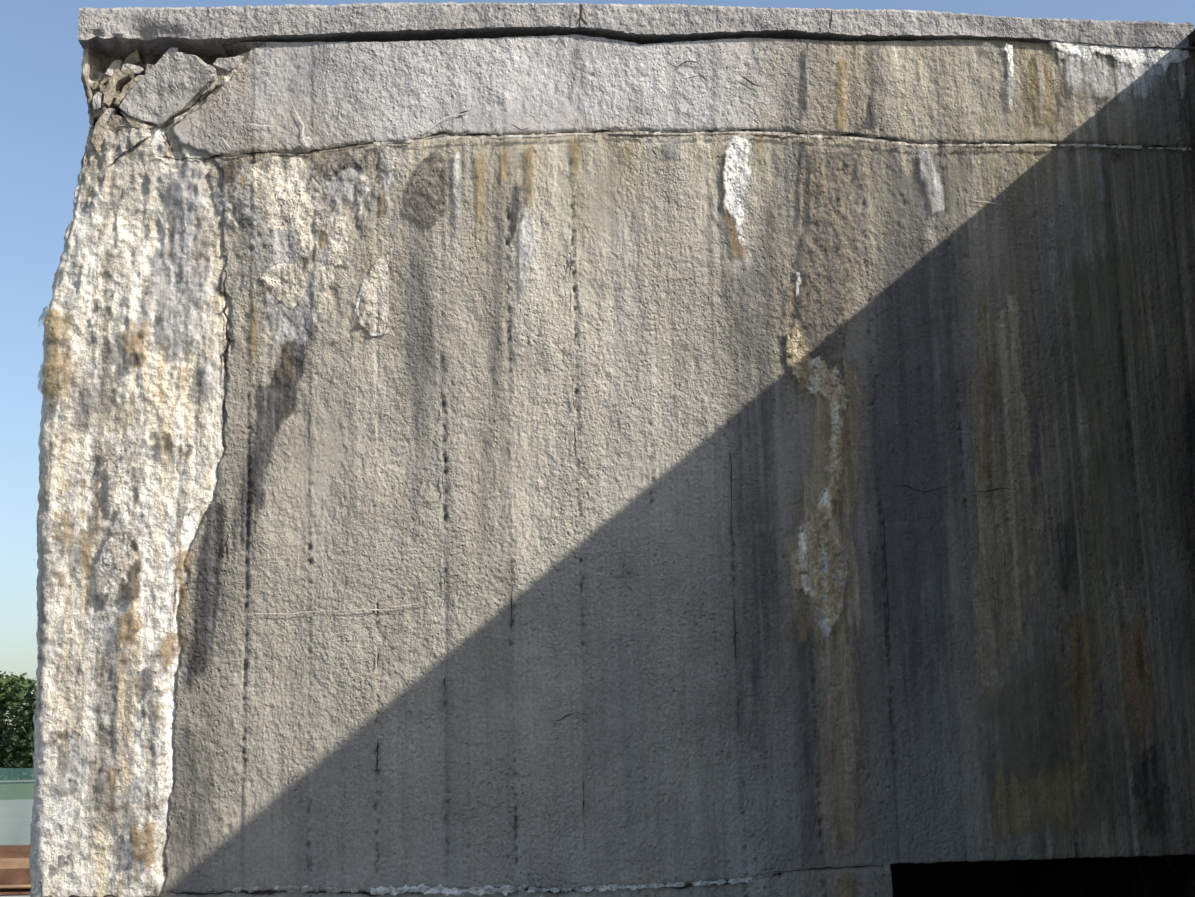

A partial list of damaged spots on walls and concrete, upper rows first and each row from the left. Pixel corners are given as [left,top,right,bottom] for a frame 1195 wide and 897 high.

crack [576,4,588,27]
crack [105,61,1191,167]
damp [919,147,944,212]
peeling [356,248,393,336]
crack [566,242,574,314]
crack [569,372,577,456]
spalling [29,45,359,897]
damp [182,324,307,687]
crack [727,455,735,567]
crack [731,601,739,663]
crack [166,865,884,897]